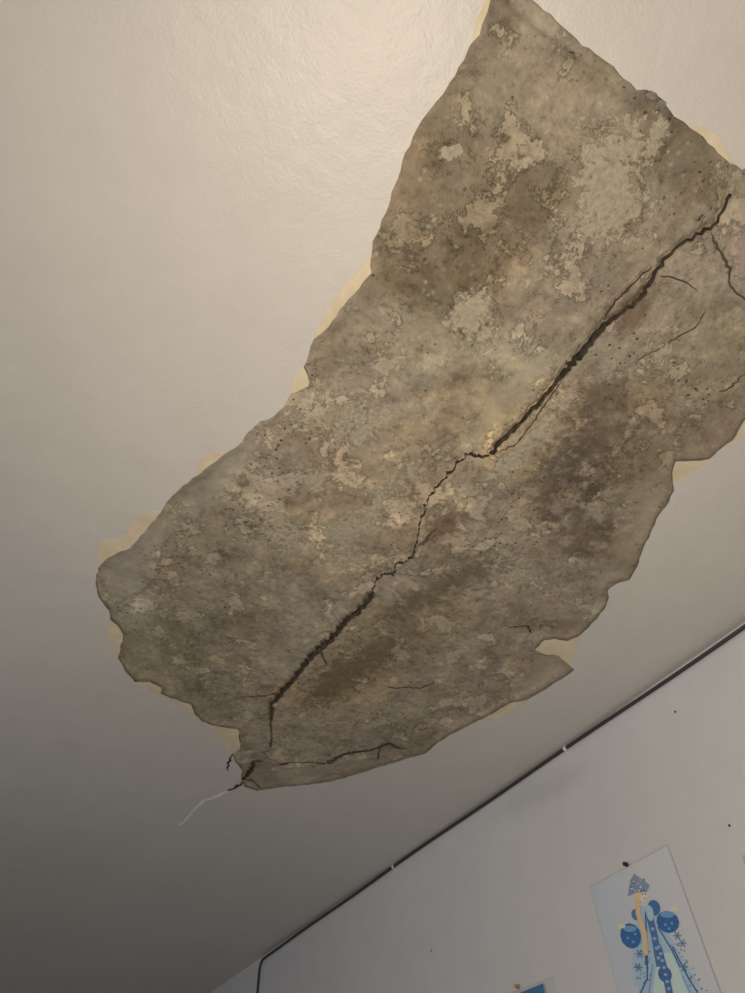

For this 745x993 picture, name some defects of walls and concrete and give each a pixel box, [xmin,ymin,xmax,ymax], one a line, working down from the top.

flaking render [96,0,745,791]
crack [178,193,745,825]